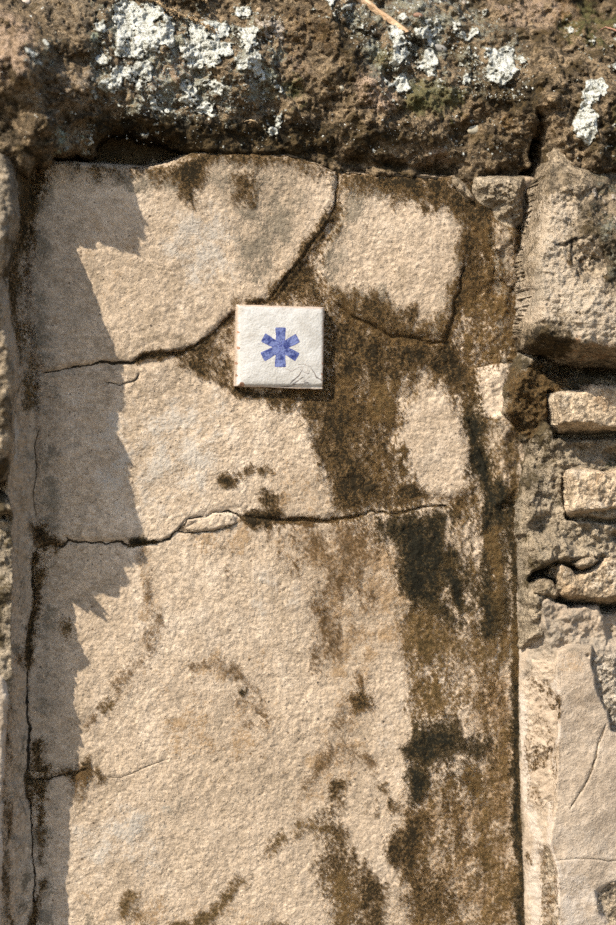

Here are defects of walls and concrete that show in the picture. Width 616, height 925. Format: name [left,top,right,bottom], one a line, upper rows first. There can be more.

crack [272,172,361,294]
water stain [484,208,523,287]
crack [44,322,223,386]
water stain [324,379,410,494]
water stain [308,579,377,676]
crack [25,504,448,925]
water stain [347,671,374,715]
water stain [429,498,559,925]
water stain [322,871,361,925]
water stain [398,759,484,925]